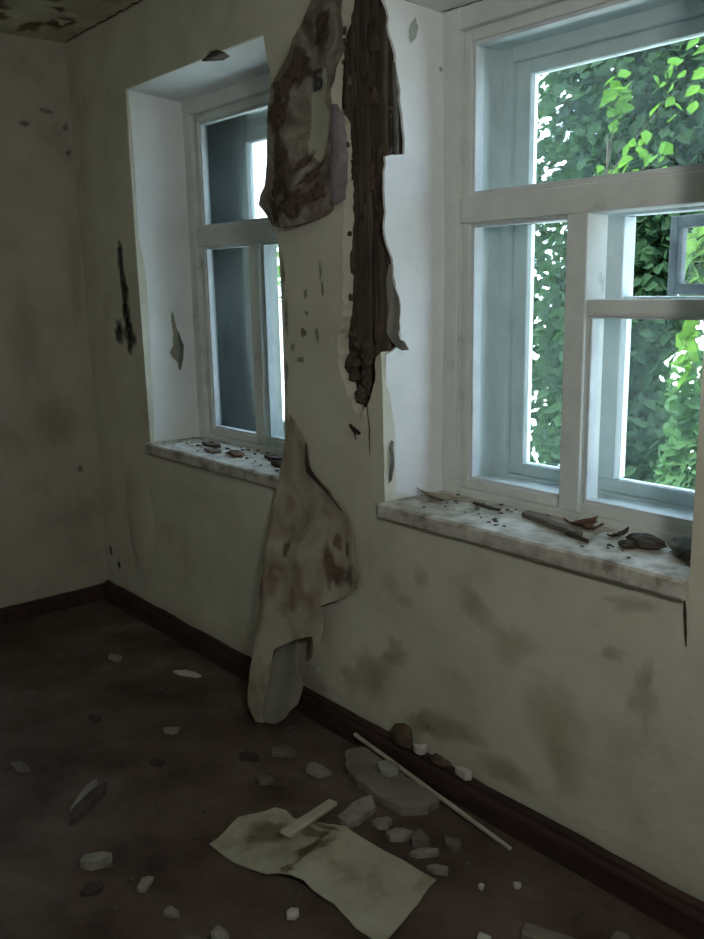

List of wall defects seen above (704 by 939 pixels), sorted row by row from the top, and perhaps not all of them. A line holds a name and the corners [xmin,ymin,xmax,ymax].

leakage [19,0,76,31]
peeling [170,313,184,370]
flaking render [264,454,282,468]